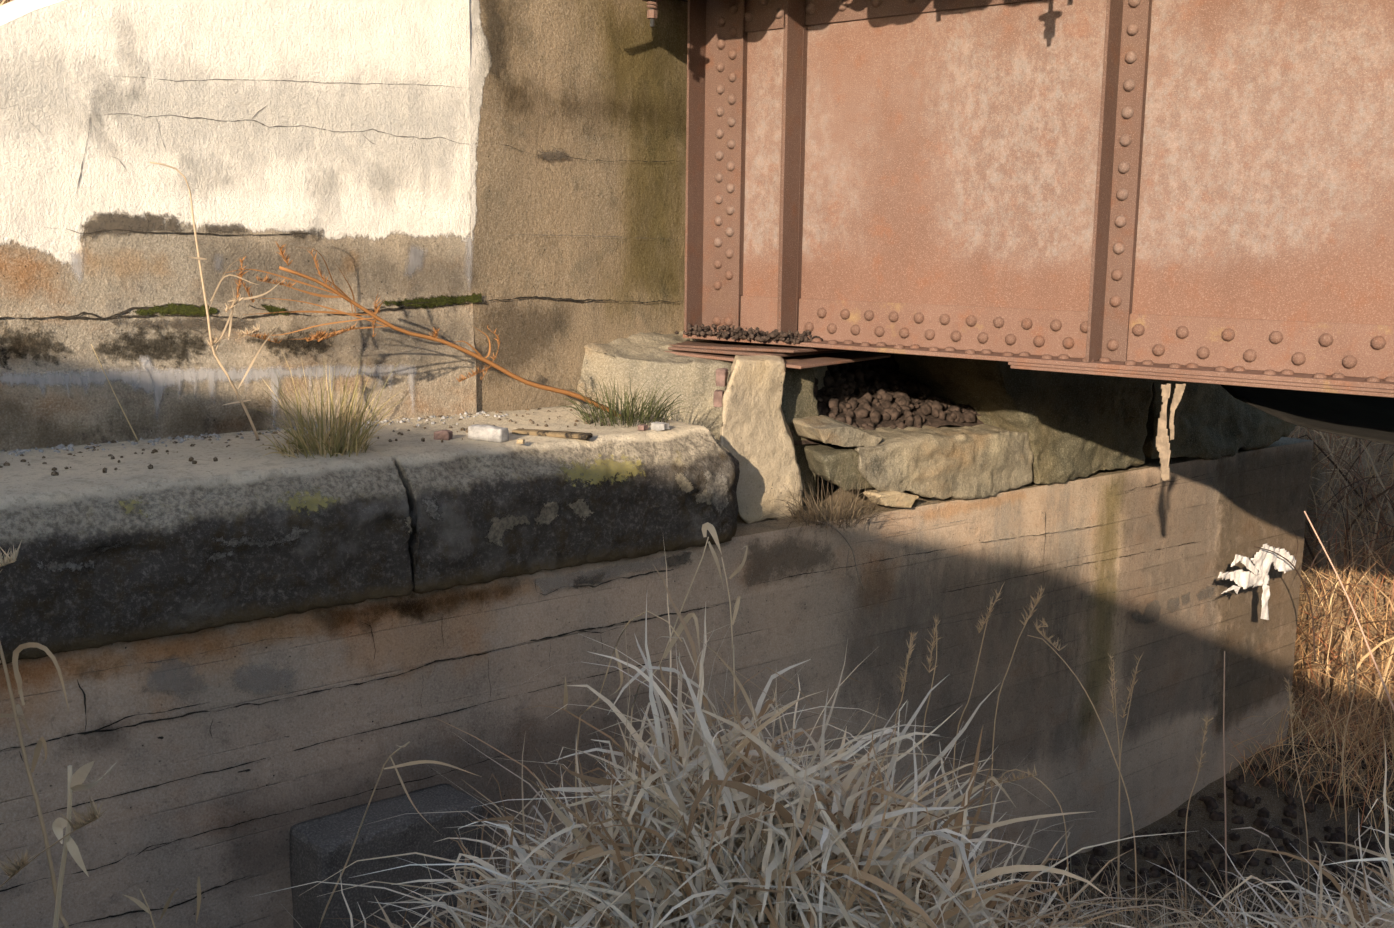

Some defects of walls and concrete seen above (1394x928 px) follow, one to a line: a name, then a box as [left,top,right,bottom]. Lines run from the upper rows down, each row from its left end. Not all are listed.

crack [120,74,241,82]
peeling [0,0,492,280]
crack [76,80,680,192]
crack [44,203,320,236]